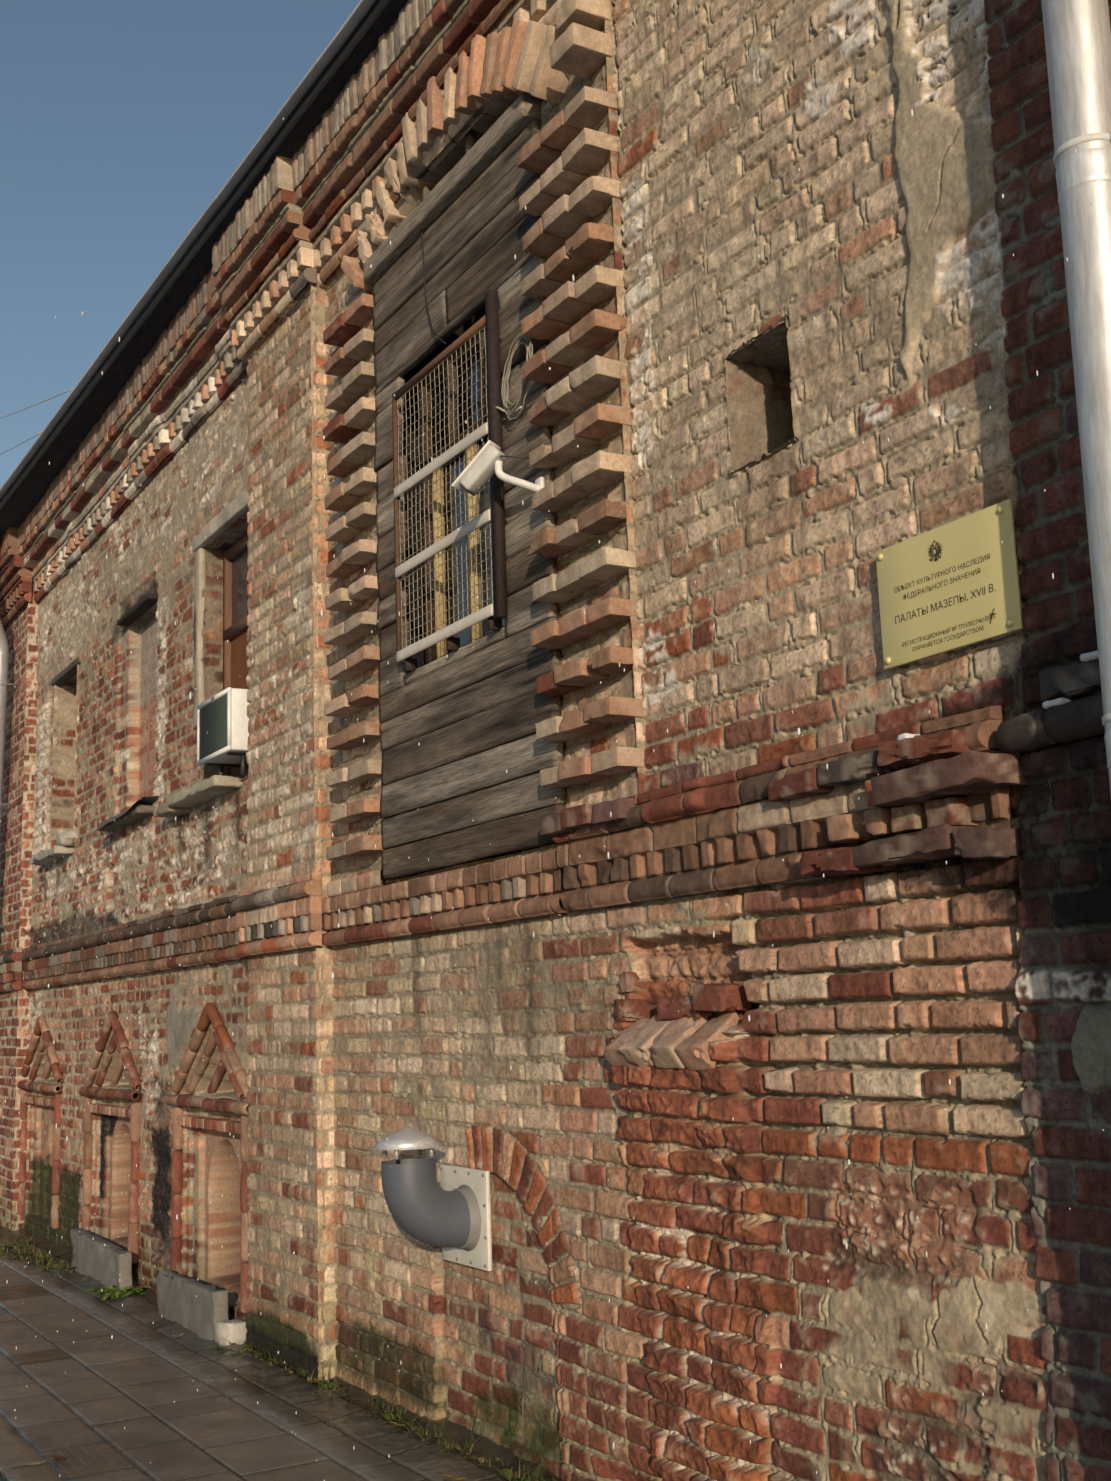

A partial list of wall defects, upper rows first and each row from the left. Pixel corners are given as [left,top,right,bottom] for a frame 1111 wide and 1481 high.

crack [925,126,962,232]
peeling [935,208,1005,346]
peeling [928,406,959,420]
spalling [824,1178,978,1290]
water stain [246,1326,319,1379]
crack [930,1273,990,1349]